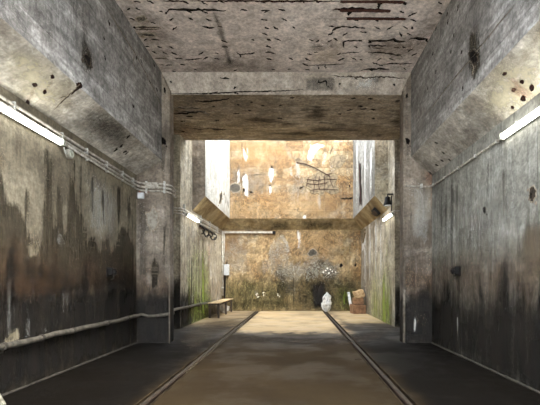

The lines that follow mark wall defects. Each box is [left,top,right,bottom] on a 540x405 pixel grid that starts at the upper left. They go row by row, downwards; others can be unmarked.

spalling [468,33,480,77]
crack [54,84,80,110]
peeling [527,185,537,205]
damp [0,149,232,394]
damp [382,262,540,391]